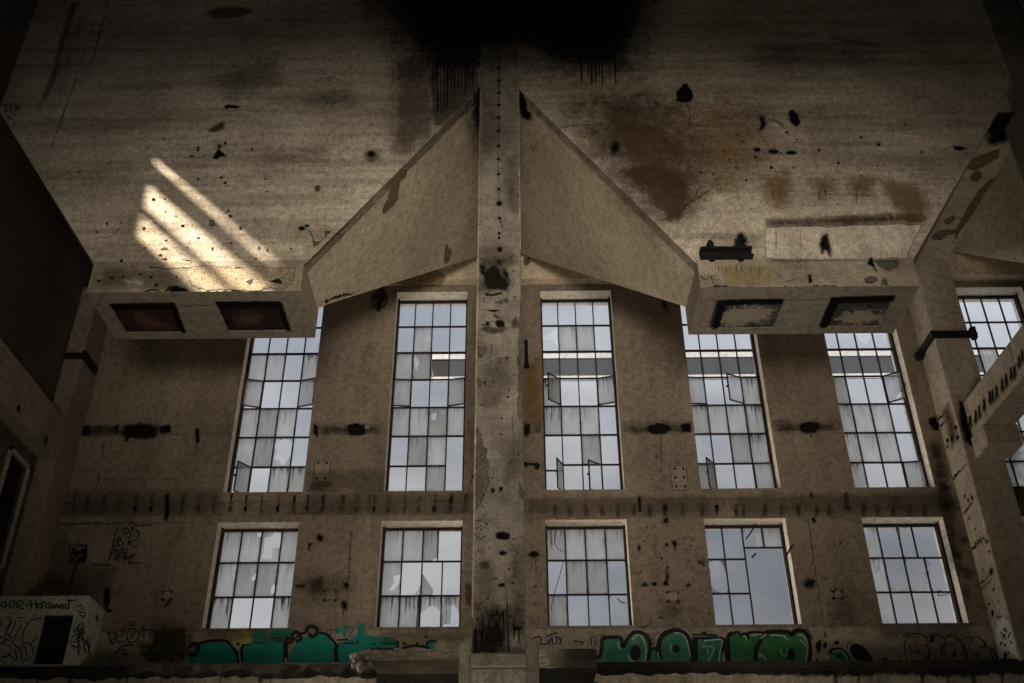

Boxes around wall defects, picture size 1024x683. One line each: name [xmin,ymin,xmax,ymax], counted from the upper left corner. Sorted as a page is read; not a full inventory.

leakage [395,59,474,153]
peeling [383,169,407,214]
leakage [567,93,700,220]
crack [661,172,724,223]
peeling [931,146,1000,240]
spalling [175,237,296,291]
peeling [449,428,503,511]
leakage [474,611,522,650]